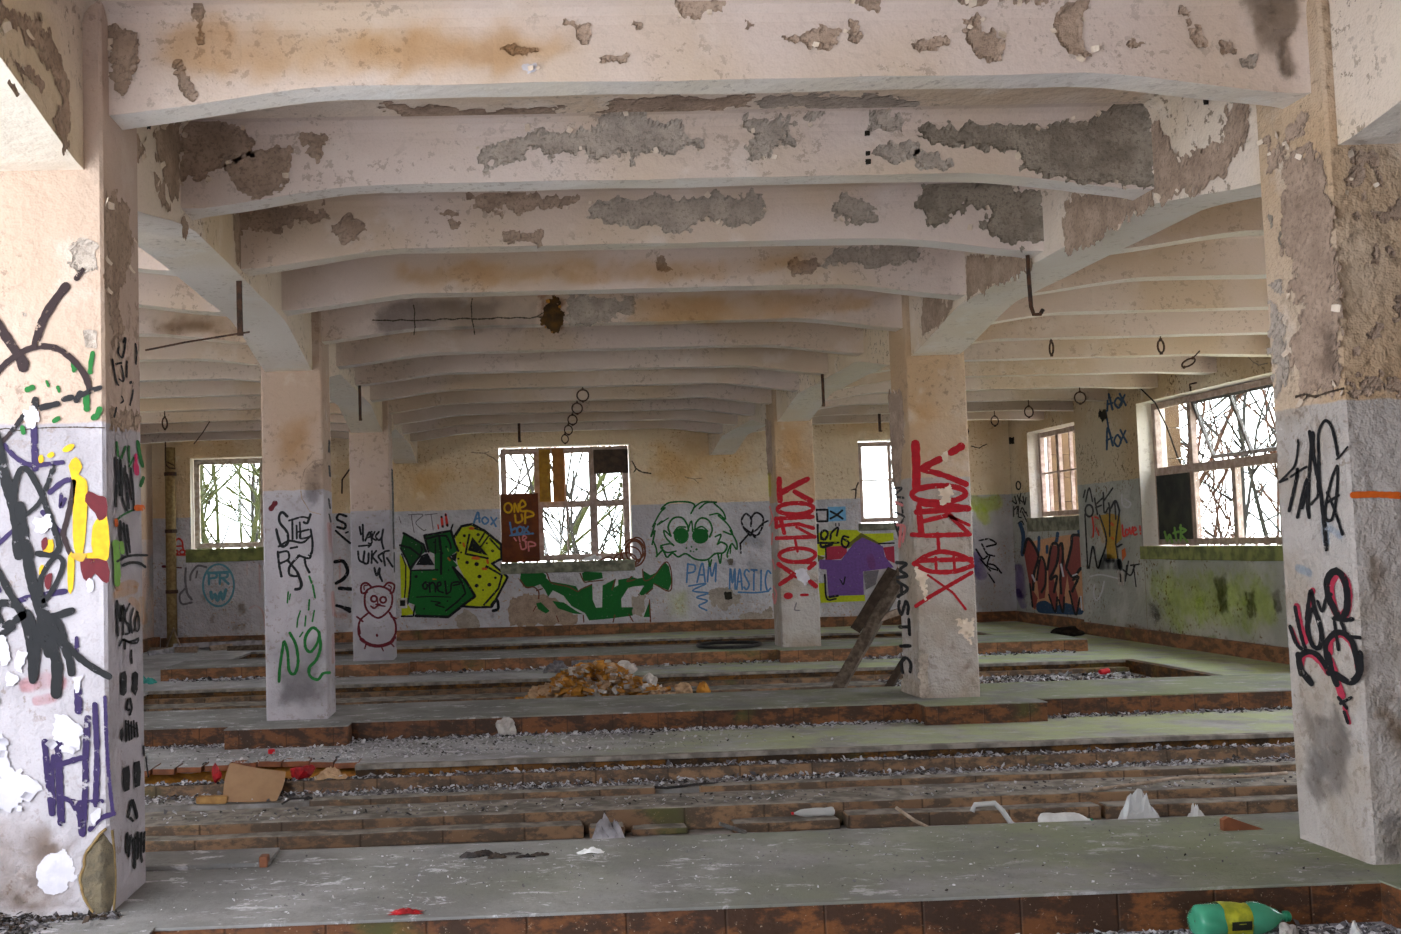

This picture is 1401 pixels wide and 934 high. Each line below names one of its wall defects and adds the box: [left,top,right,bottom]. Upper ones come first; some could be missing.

peeling [0,0,72,156]
peeling [172,59,198,102]
peeling [911,0,1049,64]
peeling [67,189,137,350]
peeling [137,119,367,269]
peeling [363,91,1401,407]